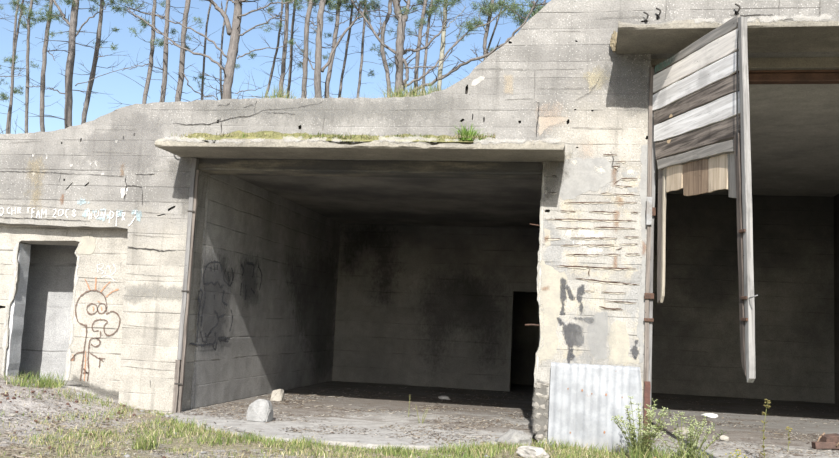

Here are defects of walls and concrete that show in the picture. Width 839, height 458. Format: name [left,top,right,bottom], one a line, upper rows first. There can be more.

crack [177,101,325,132]
peeling [532,168,568,441]
peeling [557,145,648,364]